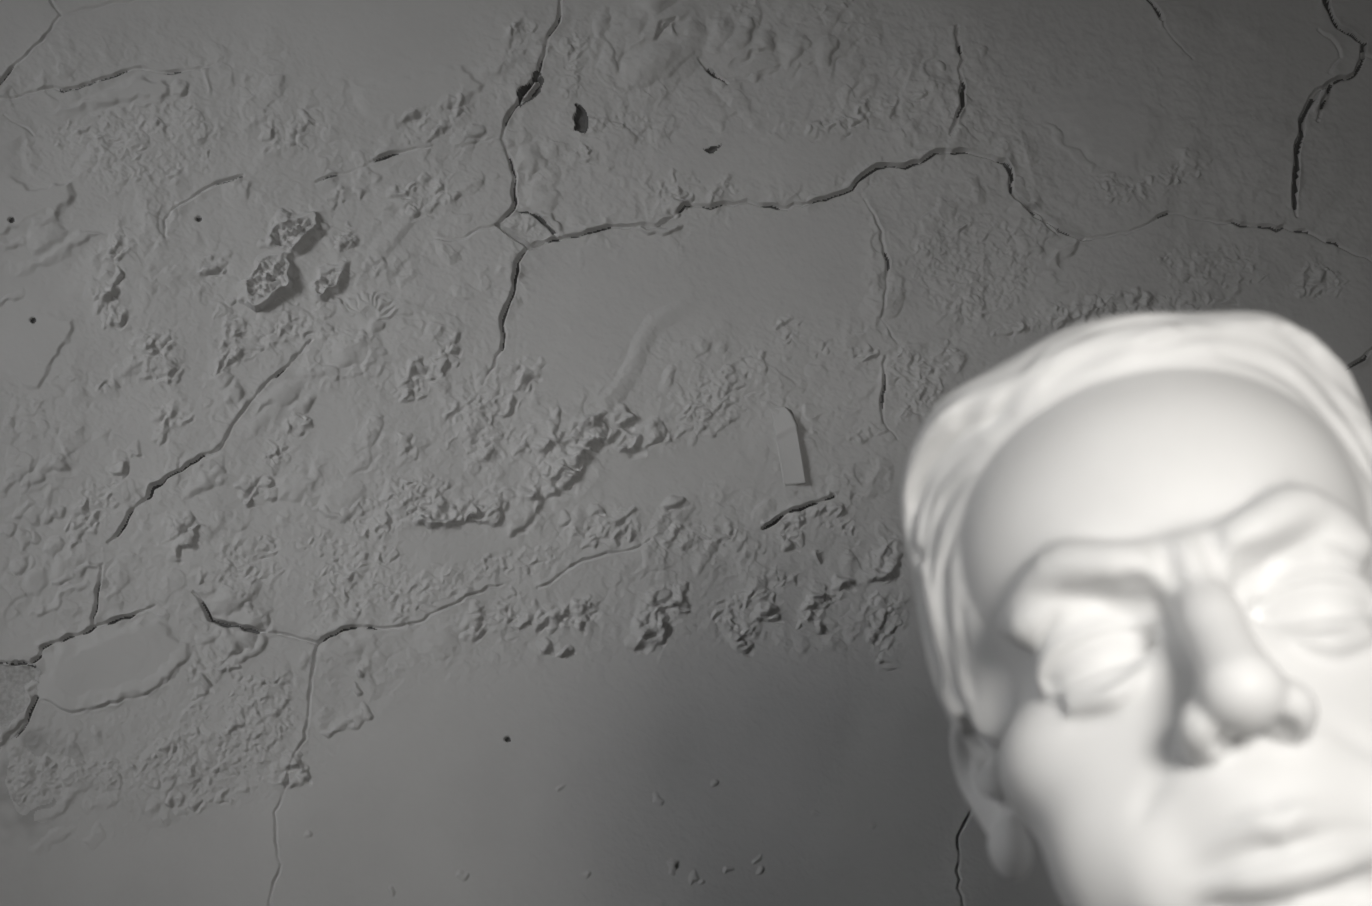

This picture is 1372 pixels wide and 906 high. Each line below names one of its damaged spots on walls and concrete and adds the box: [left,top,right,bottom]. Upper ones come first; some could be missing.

crack [0,0,220,102]
crack [97,0,1372,445]
peeling [191,208,346,379]
peeling [0,614,243,749]
crack [28,334,655,906]
peeling [267,746,311,794]
crack [952,808,973,906]